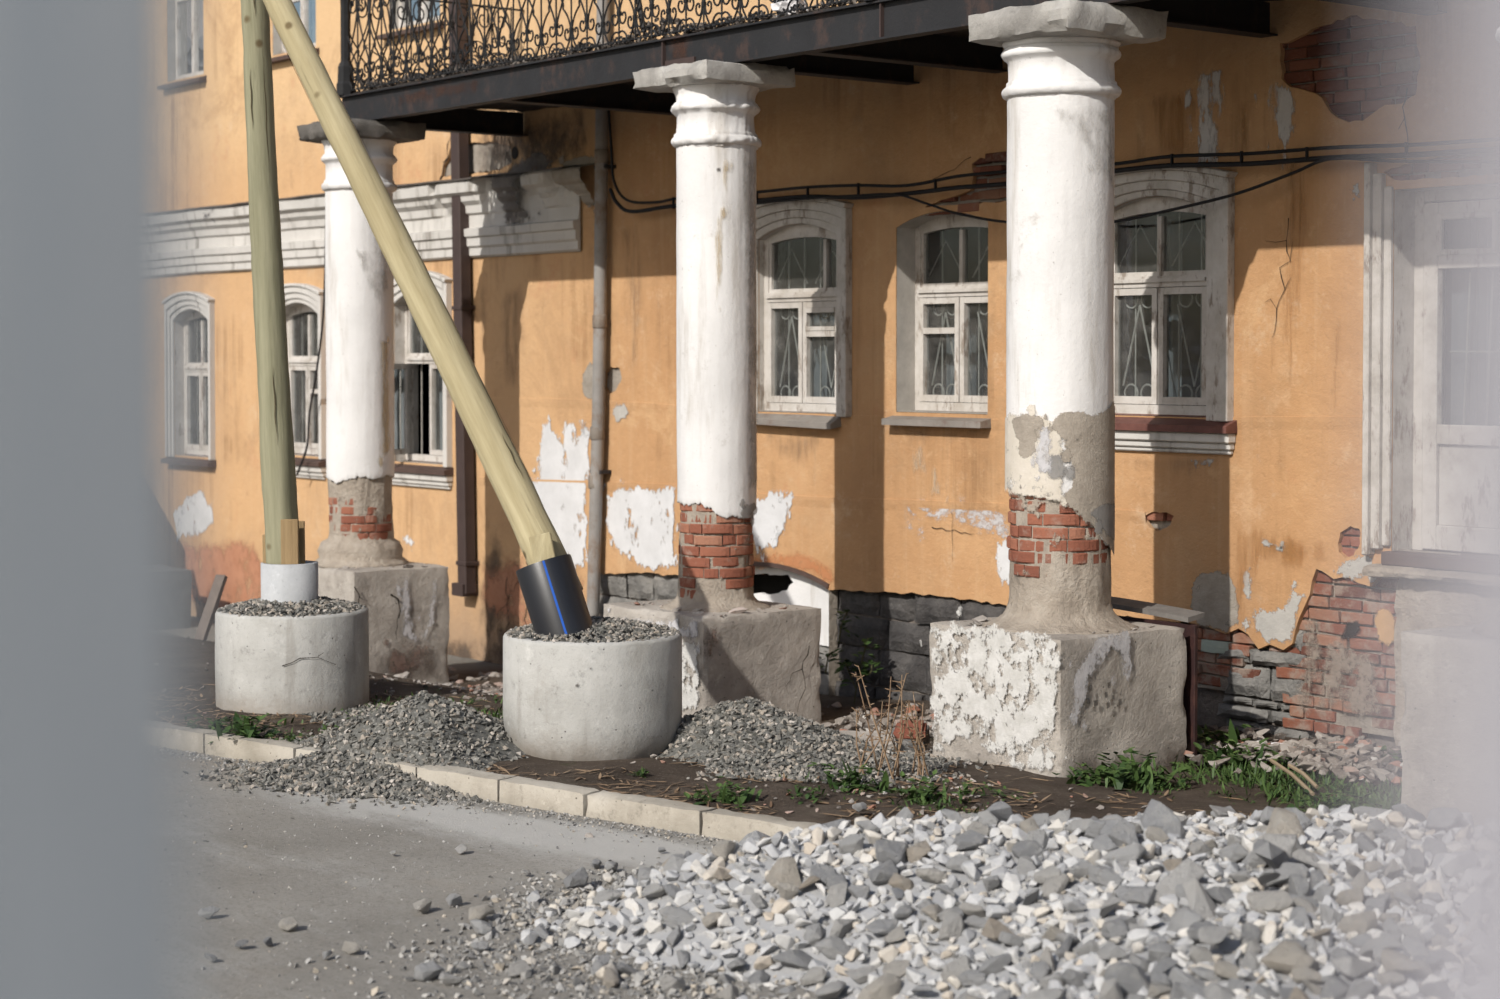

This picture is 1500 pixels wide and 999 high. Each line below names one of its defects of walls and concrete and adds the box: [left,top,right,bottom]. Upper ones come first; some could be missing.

flaking render [1282,15,1420,122]
crack [1266,218,1293,338]
flaking render [328,497,414,546]
peeling [532,415,794,599]
peeling [908,401,1115,586]
peeling [921,607,1067,771]
spalling [1086,682,1122,708]
flaking render [1189,527,1399,739]